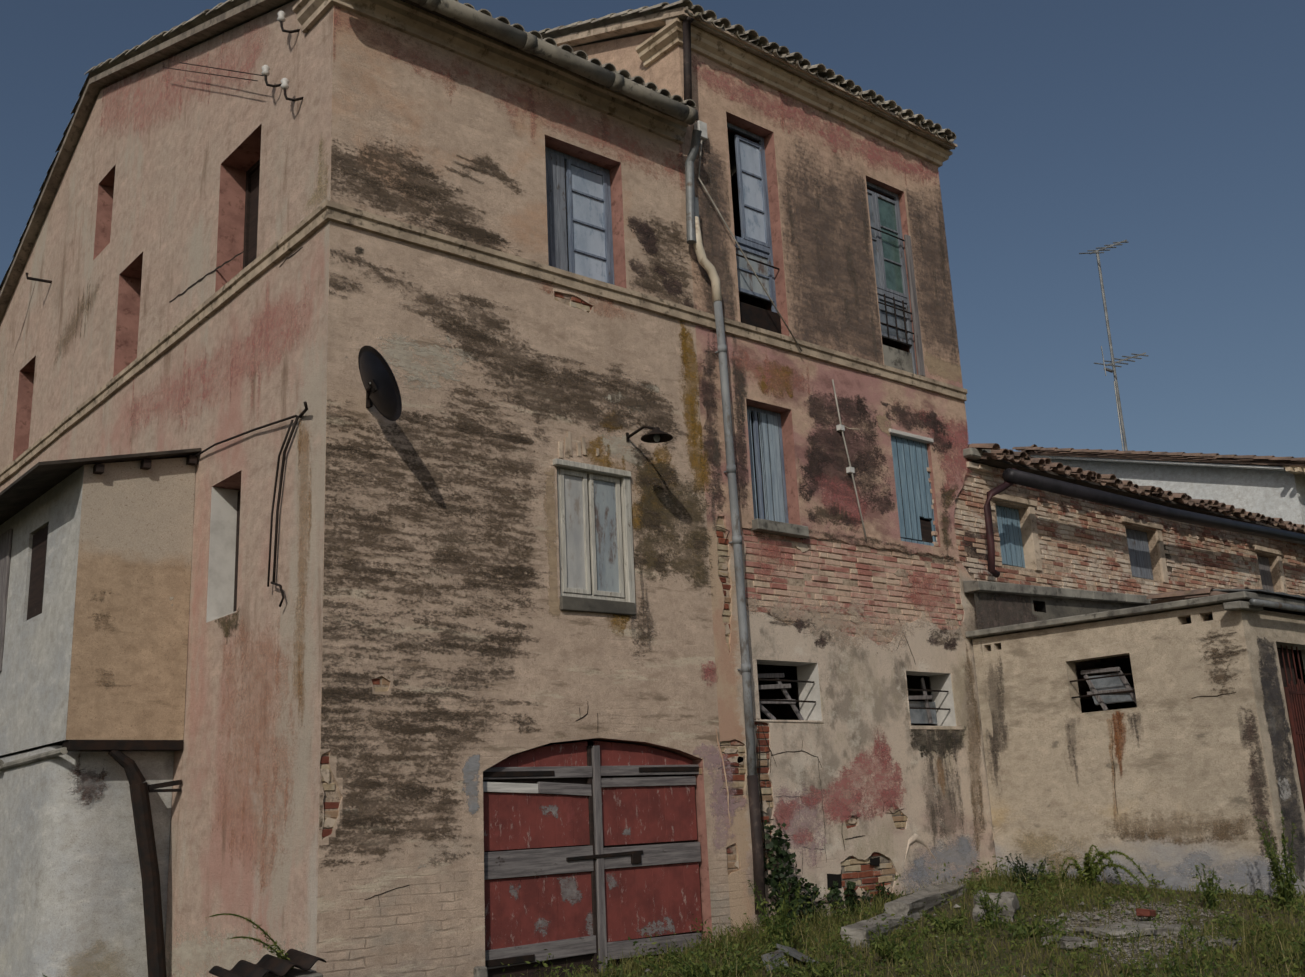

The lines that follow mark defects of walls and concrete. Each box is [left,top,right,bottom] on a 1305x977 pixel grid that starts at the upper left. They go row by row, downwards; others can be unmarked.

leakage [319,140,749,882]
flaking render [716,516,967,652]
leakage [799,393,1037,895]
leakage [70,753,108,805]
flaking render [320,750,357,840]
peeling [693,722,908,875]
corrosion [1113,711,1126,776]
leakage [1031,632,1305,891]
flaking render [815,852,896,917]